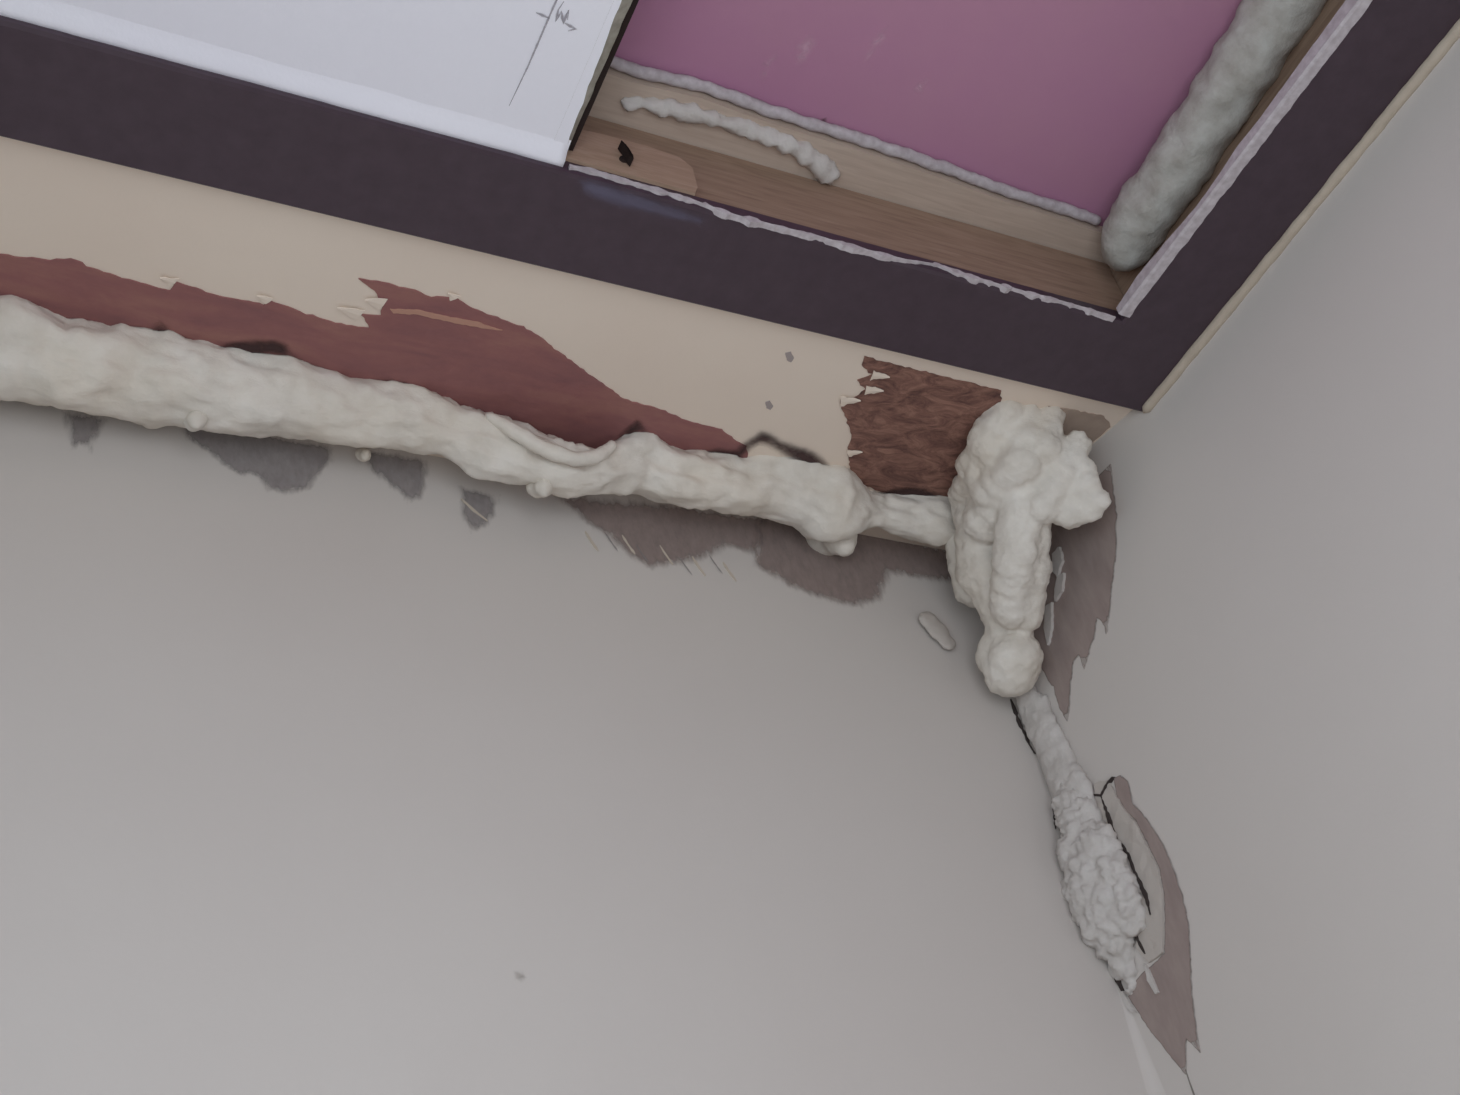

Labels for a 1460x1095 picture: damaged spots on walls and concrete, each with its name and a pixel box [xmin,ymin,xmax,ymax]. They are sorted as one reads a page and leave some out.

peeling [0,254,748,458]
peeling [840,356,1002,497]
peeling [1034,465,1118,716]
crack [1010,699,1036,754]
crack [1114,979,1125,991]
crack [1094,777,1151,954]
peeling [1094,776,1200,1072]